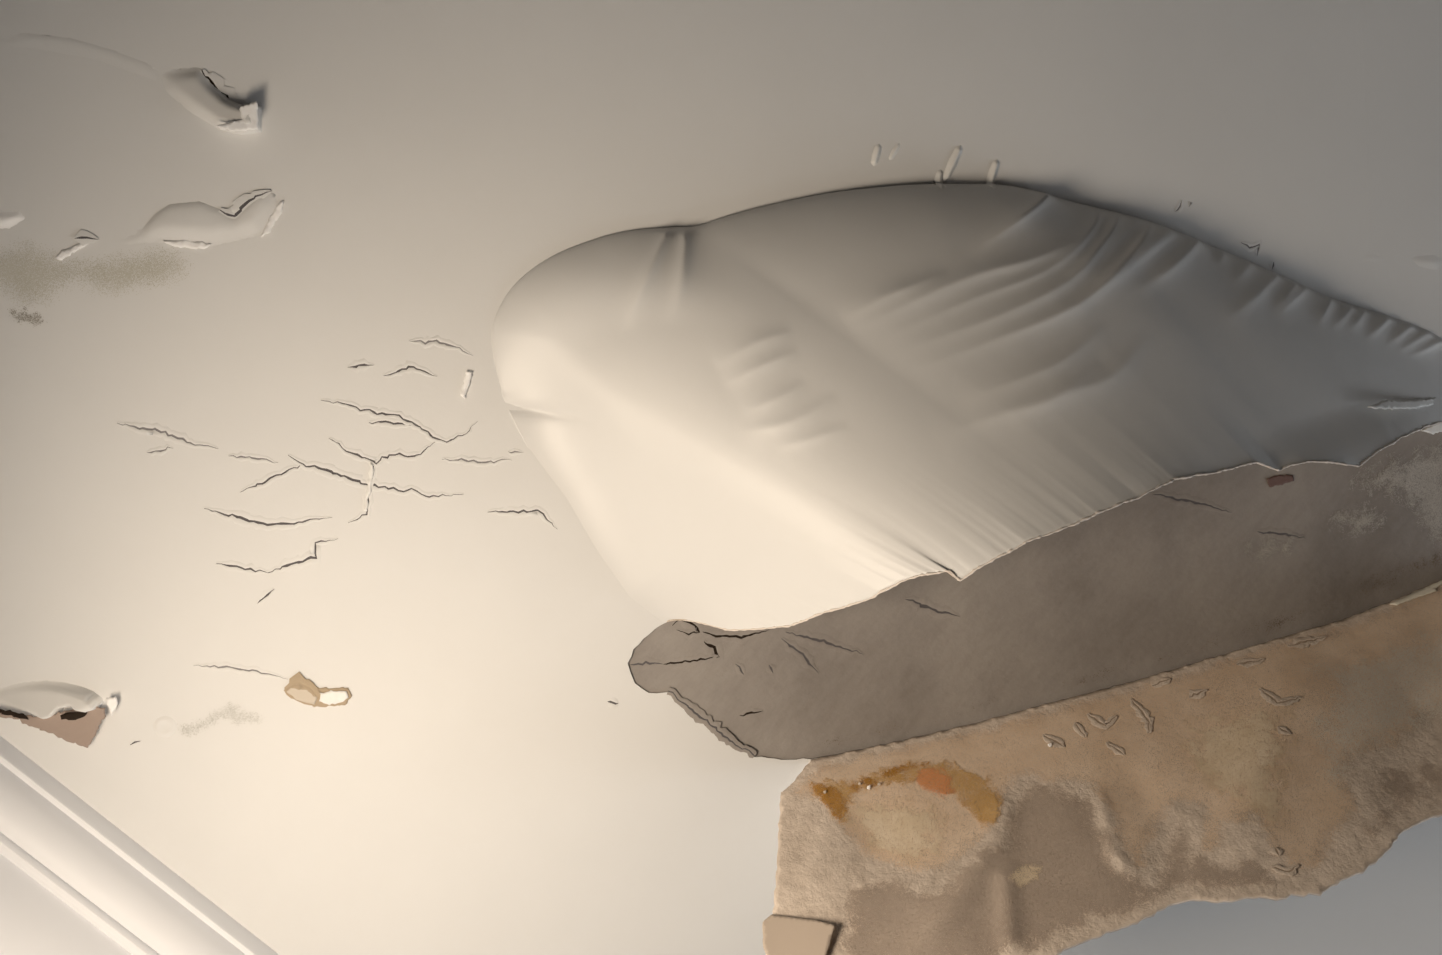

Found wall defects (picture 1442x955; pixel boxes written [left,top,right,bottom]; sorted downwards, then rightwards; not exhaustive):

peeling [55,230,98,260]
leakage [0,239,194,325]
peeling [118,190,284,249]
crack [117,335,558,604]
spalling [284,672,352,707]
flaking render [628,427,1442,955]
leakage [836,782,1278,955]